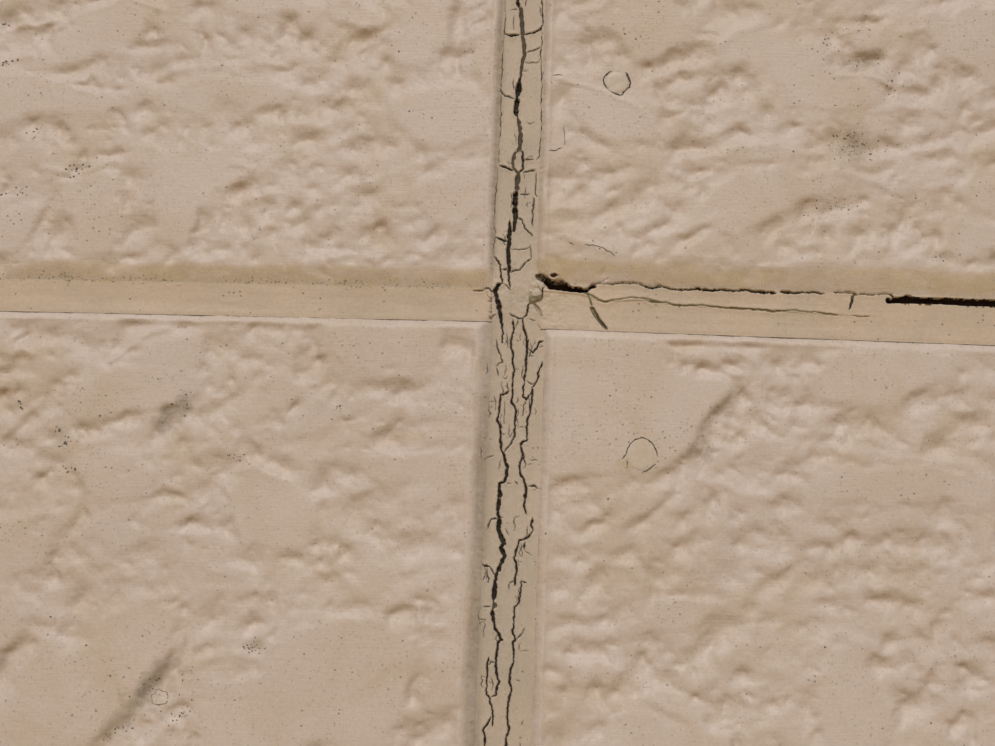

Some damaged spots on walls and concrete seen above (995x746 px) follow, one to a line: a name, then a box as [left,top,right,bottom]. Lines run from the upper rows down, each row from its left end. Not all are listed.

crack [469,0,565,746]
crack [569,242,894,317]